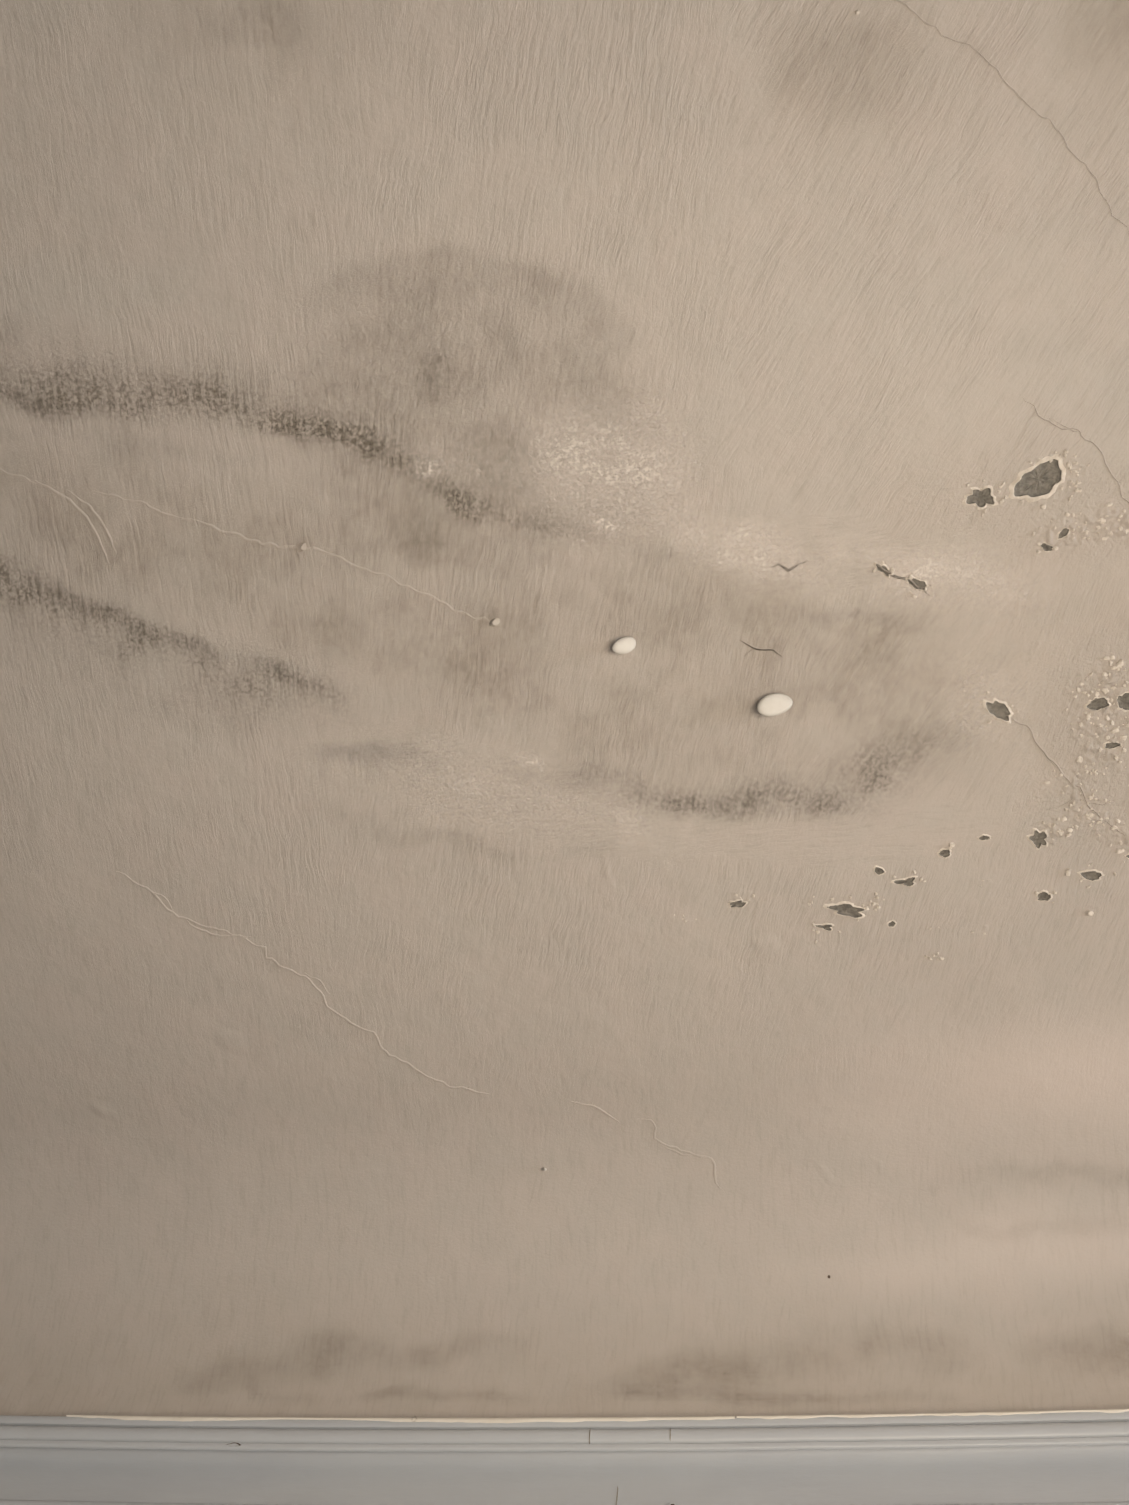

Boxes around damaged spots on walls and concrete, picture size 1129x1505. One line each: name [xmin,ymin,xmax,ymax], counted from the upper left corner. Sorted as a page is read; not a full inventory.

crack [896,0,1129,234]
leakage [175,384,305,435]
leakage [536,409,673,531]
spalling [962,449,1077,516]
crack [0,468,490,622]
spalling [1037,527,1075,554]
spalling [982,691,1019,724]
spalling [1083,683,1129,719]
peeling [1026,770,1129,888]
spalling [873,865,926,887]
spalling [812,896,870,934]
crack [116,871,489,1094]